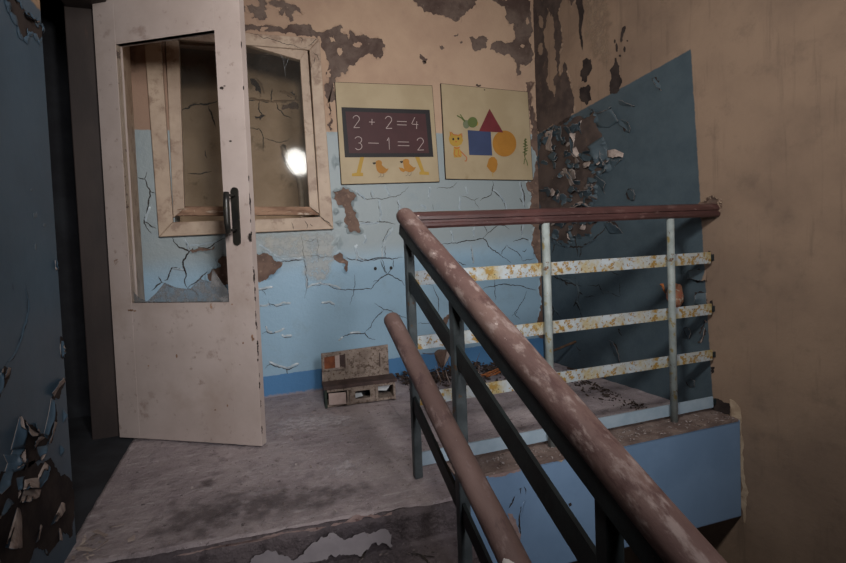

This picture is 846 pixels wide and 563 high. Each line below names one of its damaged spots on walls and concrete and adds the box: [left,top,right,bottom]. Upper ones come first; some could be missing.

peeling [243,0,386,135]
peeling [412,0,634,209]
crack [138,173,155,234]
peeling [331,185,364,235]
crack [421,181,532,265]
crack [153,234,225,295]
peeling [253,250,283,301]
crack [259,186,439,341]
crack [485,280,533,317]
crack [552,271,620,317]
peeling [0,377,75,563]
peeling [250,529,392,563]